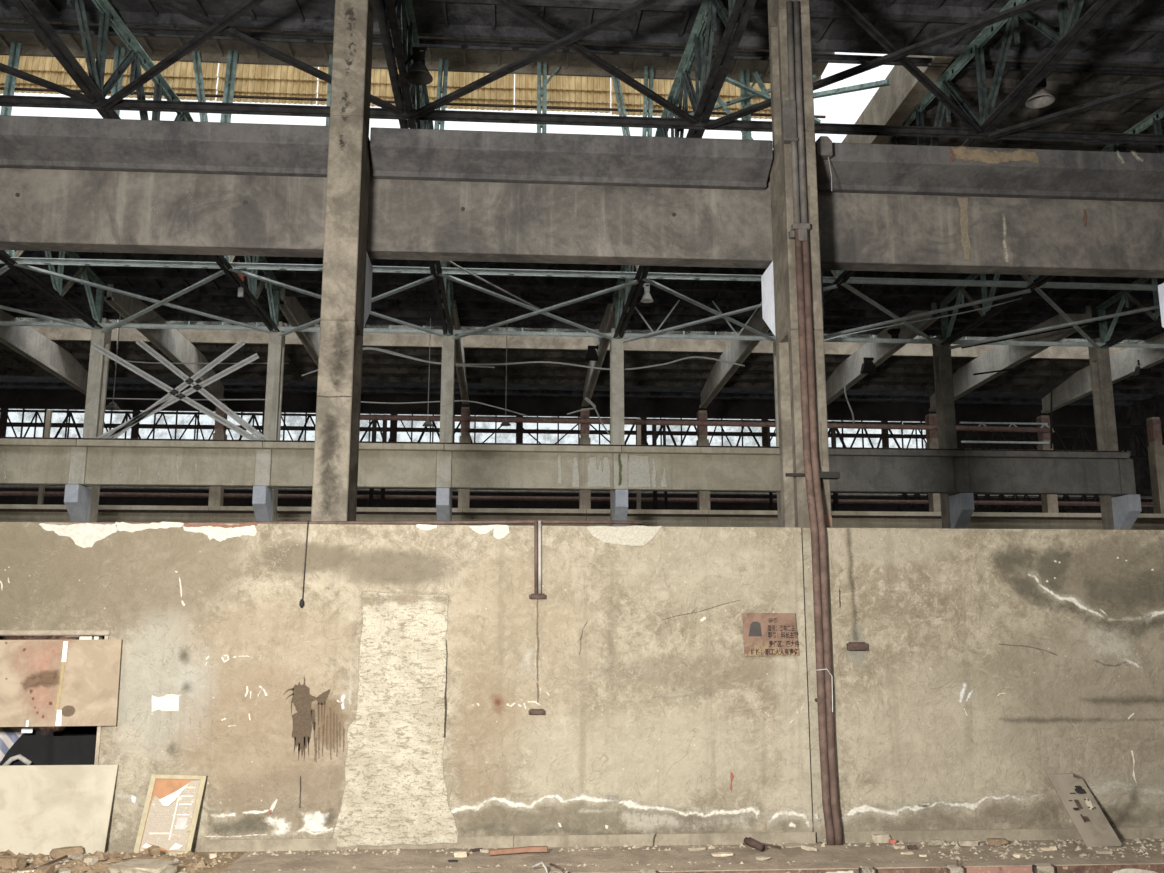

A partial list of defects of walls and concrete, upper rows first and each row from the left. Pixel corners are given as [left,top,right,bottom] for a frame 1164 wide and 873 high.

spalling [39,522,257,548]
water stain [998,551,1164,667]
water stain [283,677,345,762]
efflorescence [450,793,818,831]
efflorescence [840,793,1037,821]